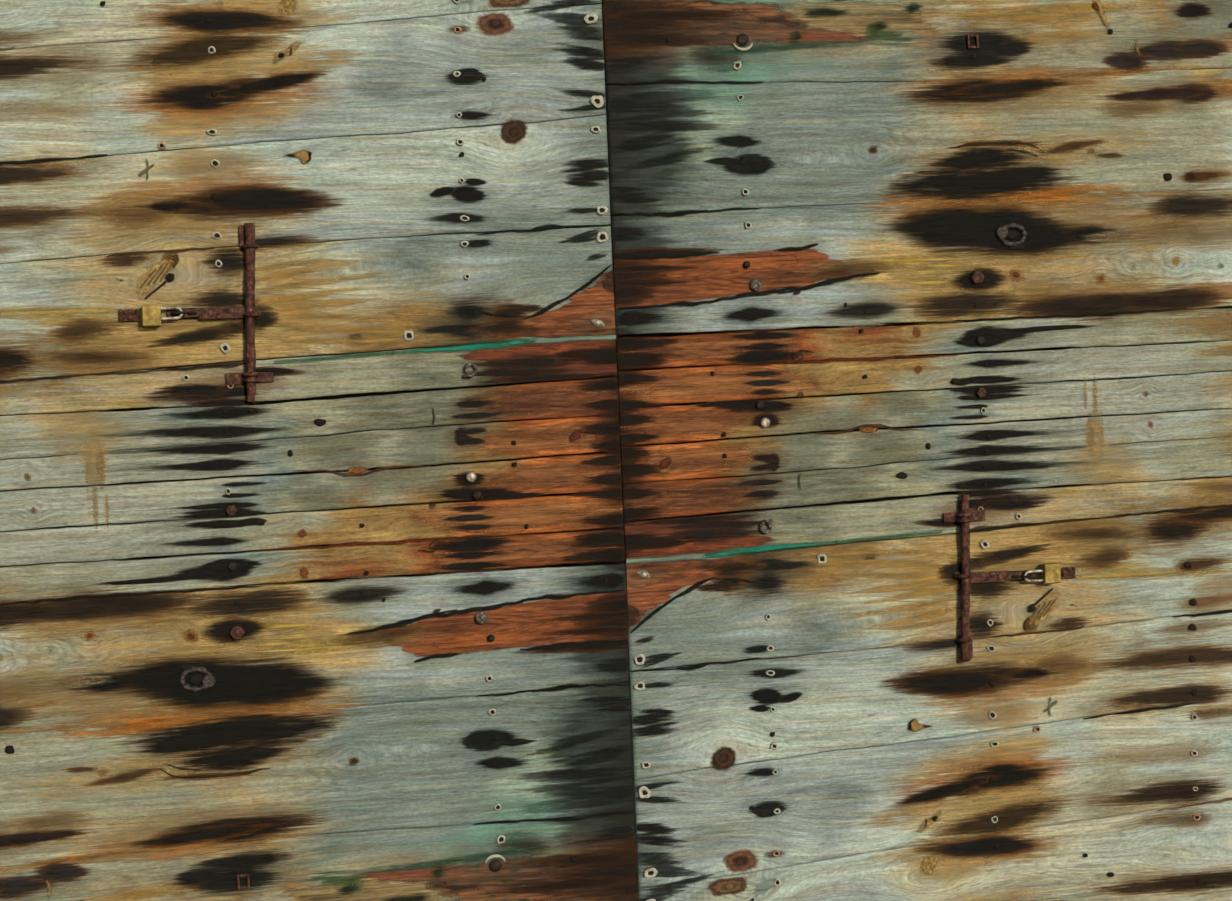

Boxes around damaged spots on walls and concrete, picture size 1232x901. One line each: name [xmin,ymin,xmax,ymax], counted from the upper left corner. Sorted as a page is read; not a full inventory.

crack [475,207,761,235]
crack [778,243,818,251]
crack [481,251,719,319]
crack [617,272,879,309]
leakage [811,139,1232,527]
leakage [256,367,300,376]
leakage [0,385,424,786]
crack [347,590,625,635]
crack [520,577,755,651]
crack [415,653,458,663]
crack [476,657,759,697]